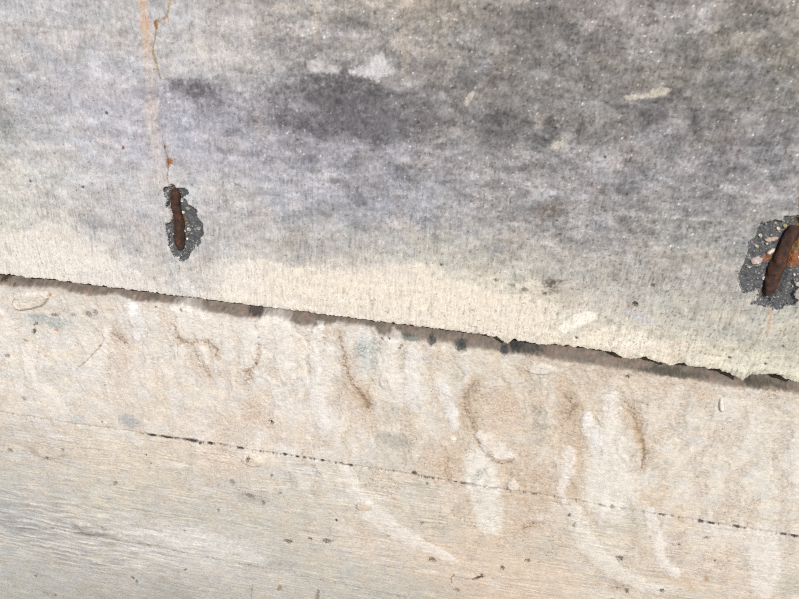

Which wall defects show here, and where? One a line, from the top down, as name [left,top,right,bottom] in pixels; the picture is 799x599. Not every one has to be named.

crack [151,0,172,80]
crack [162,136,174,186]
spalling [163,185,204,261]
spalling [738,215,799,310]